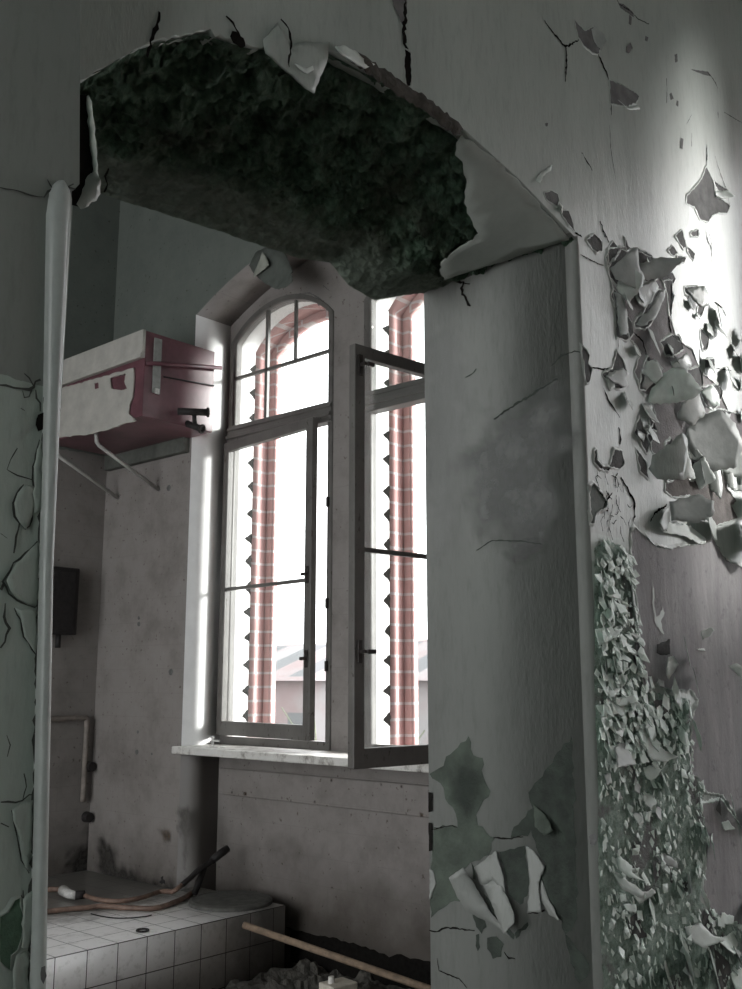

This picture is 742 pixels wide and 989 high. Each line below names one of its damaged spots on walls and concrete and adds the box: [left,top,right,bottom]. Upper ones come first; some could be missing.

crack [392,0,413,88]
flaking render [80,11,574,300]
peeling [685,145,735,256]
crack [0,373,41,411]
flaking render [470,378,571,559]
peeling [543,190,742,989]
peeling [429,736,590,983]